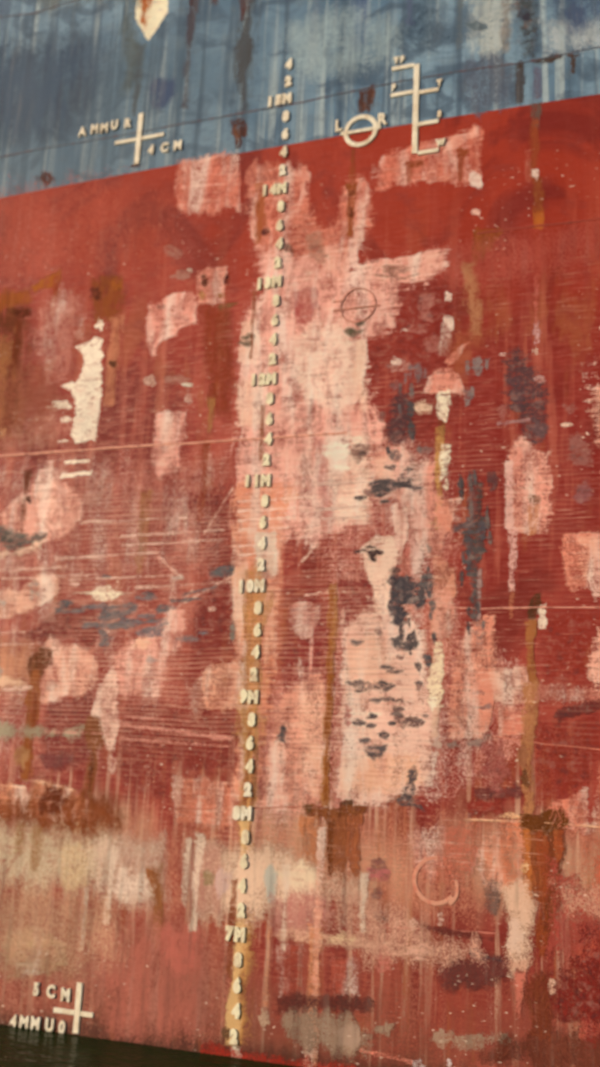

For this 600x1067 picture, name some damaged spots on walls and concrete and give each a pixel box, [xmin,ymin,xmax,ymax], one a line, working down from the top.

corrosion [524,100,545,230]
corrosion [89,272,128,407]
peeling [0,124,600,841]
peeling [261,817,360,1067]
corrosion [298,582,369,882]
peeling [366,857,390,924]
peeling [476,812,530,892]
corrosion [513,592,575,1045]